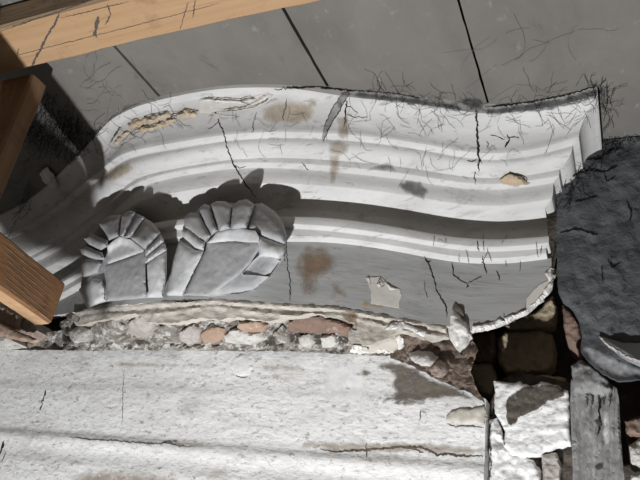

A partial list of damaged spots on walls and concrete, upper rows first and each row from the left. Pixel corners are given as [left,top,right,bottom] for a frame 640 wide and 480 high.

peeling [109,92,274,146]
crack [209,112,257,199]
crack [275,86,420,127]
peeling [500,173,530,186]
crack [468,86,595,185]
crack [573,147,621,182]
peeling [366,277,401,308]
crack [424,258,447,316]
flaking render [472,268,556,334]
flaking render [349,322,427,355]
leakage [380,363,468,405]
crack [321,405,505,477]